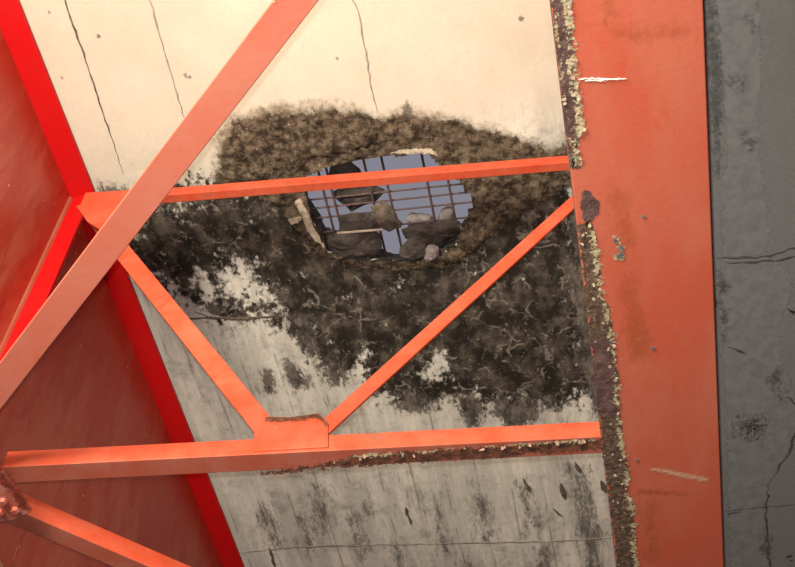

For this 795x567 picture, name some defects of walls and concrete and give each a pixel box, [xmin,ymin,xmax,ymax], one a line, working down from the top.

crack [64,0,123,173]
crack [149,0,184,117]
leakage [173,171,219,188]
crack [352,0,377,110]
spalling [215,0,587,271]
leakage [129,179,570,395]
leakage [373,211,598,427]
crack [715,247,795,264]
peeling [576,190,640,567]
corrosion [0,466,29,510]
corrosion [257,438,601,475]